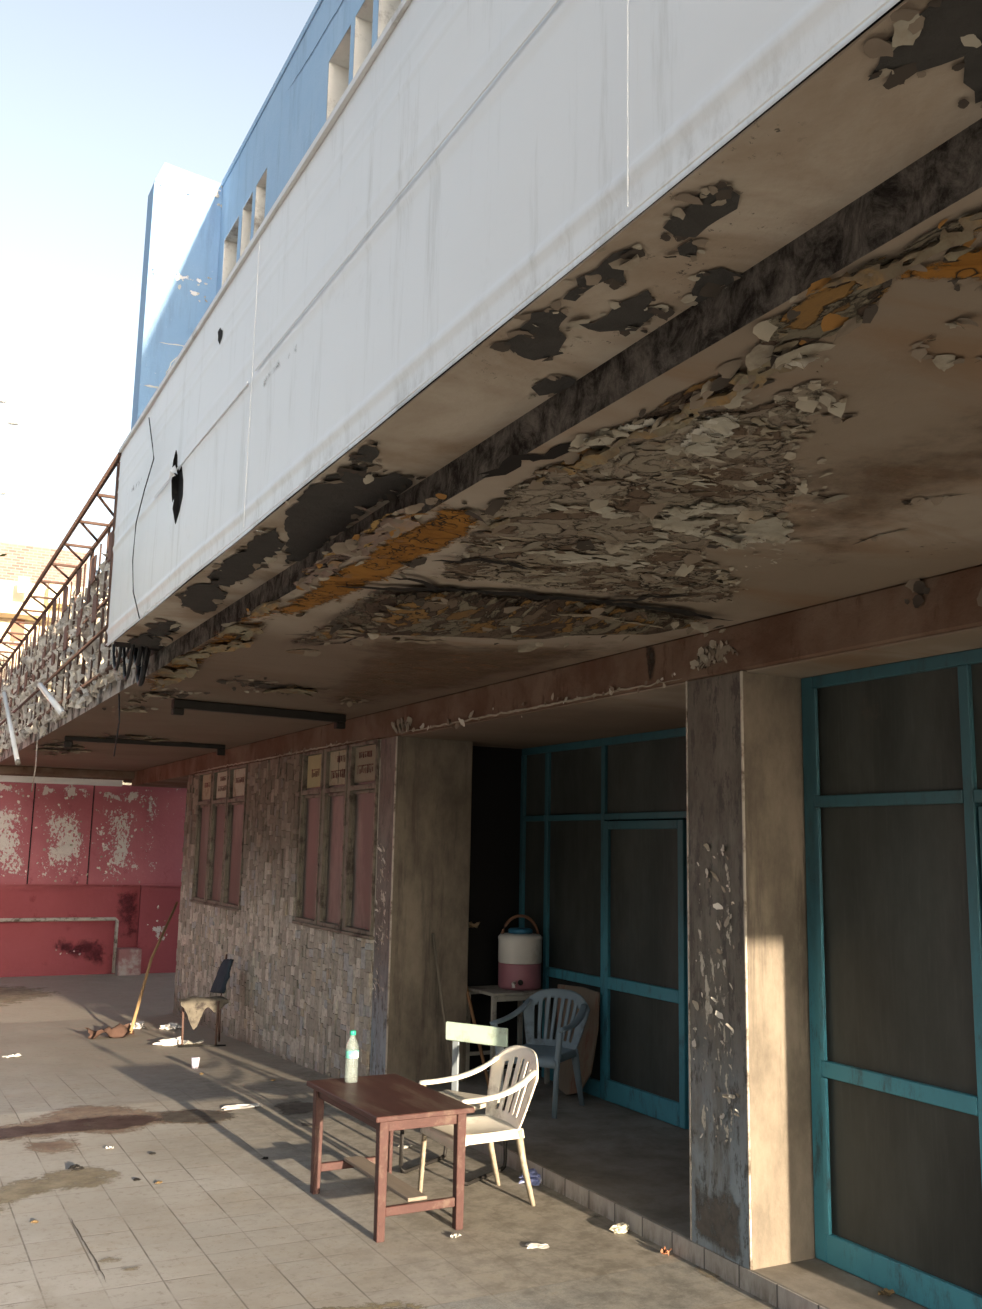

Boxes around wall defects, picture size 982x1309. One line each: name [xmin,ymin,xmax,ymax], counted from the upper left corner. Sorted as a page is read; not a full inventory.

peeling [863,0,982,109]
peeling [153,264,212,302]
corrosion [900,247,982,291]
peeling [432,181,982,603]
peeling [175,441,447,615]
peeling [125,619,181,648]
peeling [0,783,159,883]
peeling [692,843,740,1142]
leakage [0,1105,234,1140]
leakage [323,1300,426,1309]